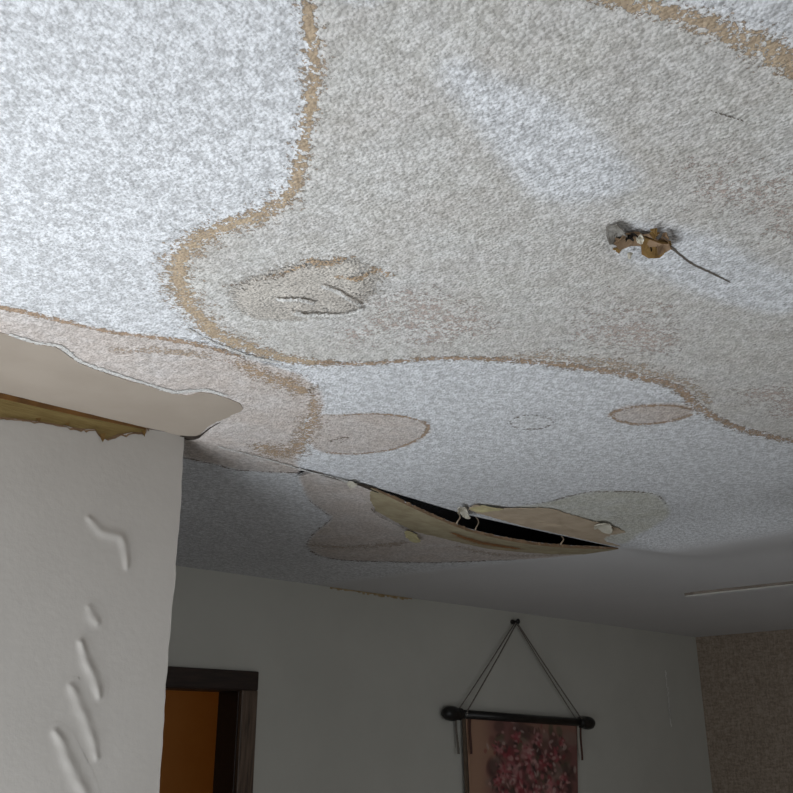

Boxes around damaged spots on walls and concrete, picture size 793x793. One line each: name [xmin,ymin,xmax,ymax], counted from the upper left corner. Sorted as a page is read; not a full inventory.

water stain [0,0,793,563]
spalling [606,223,731,283]